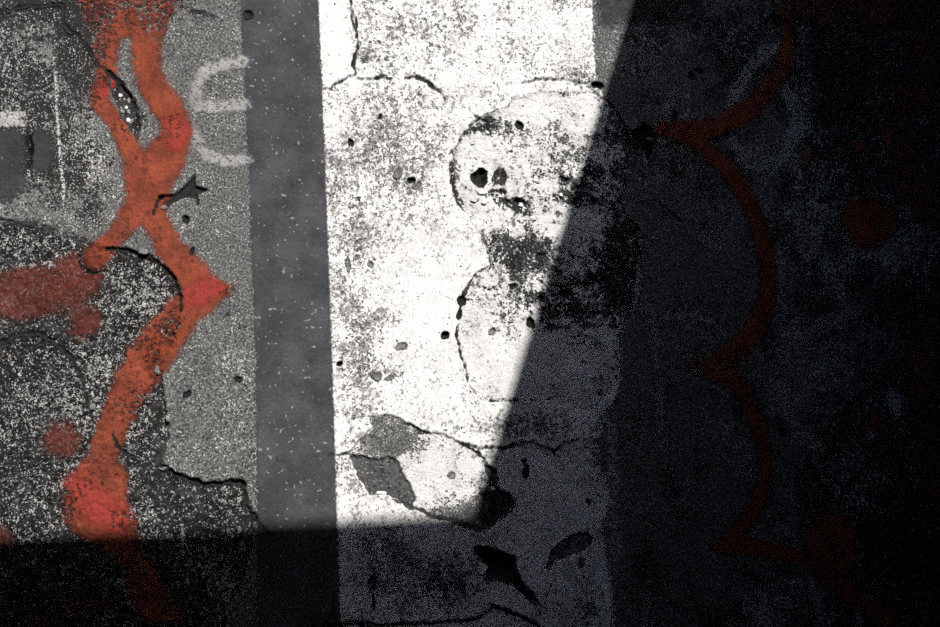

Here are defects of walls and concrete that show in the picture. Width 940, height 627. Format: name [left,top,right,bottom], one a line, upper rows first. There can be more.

crack [321,0,446,100]
crack [521,77,631,142]
crack [455,332,469,382]
flaking render [0,217,256,627]
peeling [349,414,517,531]
crack [312,547,548,627]
hole [474,545,536,601]
peeling [546,532,593,569]